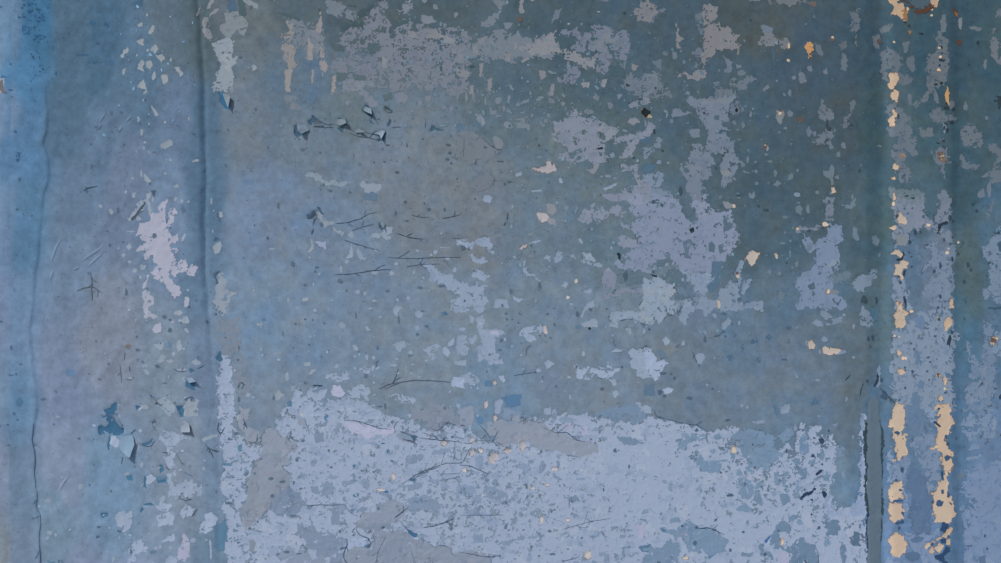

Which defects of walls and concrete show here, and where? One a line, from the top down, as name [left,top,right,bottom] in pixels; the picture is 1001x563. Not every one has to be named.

peeling [888,0,923,34]
peeling [887,72,900,127]
peeling [305,172,384,193]
peeling [503,161,563,185]
peeling [117,173,201,375]
peeling [146,192,1001,563]
peeling [114,511,148,563]